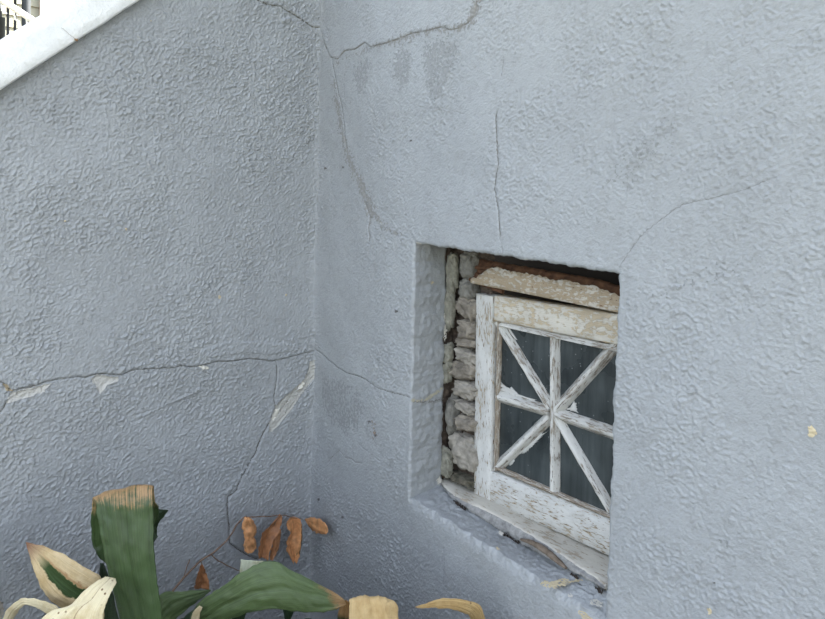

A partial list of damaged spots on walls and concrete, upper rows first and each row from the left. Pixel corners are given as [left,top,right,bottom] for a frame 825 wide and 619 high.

crack [258,0,477,146]
crack [494,114,503,253]
spalling [2,383,51,403]
spalling [91,374,119,394]
spalling [269,360,316,432]
crack [0,351,443,559]
peeling [540,578,583,597]